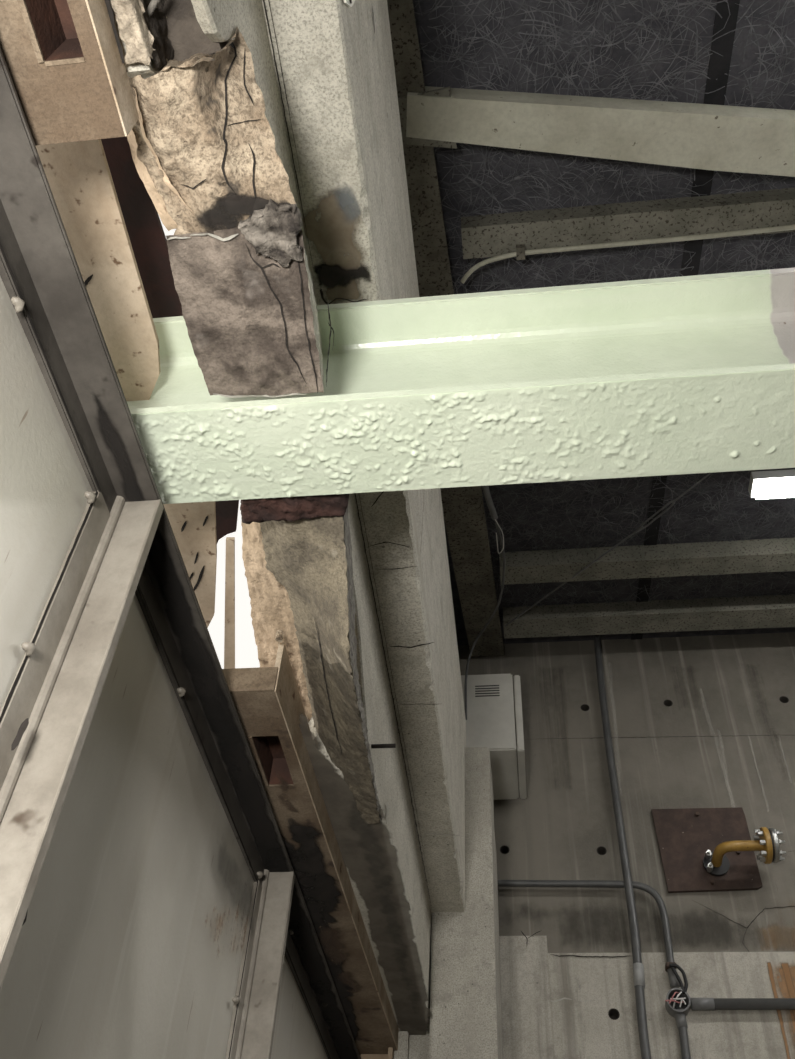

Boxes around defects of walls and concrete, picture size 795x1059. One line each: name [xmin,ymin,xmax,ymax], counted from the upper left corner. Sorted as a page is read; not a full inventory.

crack [181,42,261,196]
spalling [110,0,370,304]
crack [245,243,334,393]
spalling [241,507,381,825]
damp [279,777,360,1042]
crack [706,906,795,950]
corrosion [767,962,795,1059]